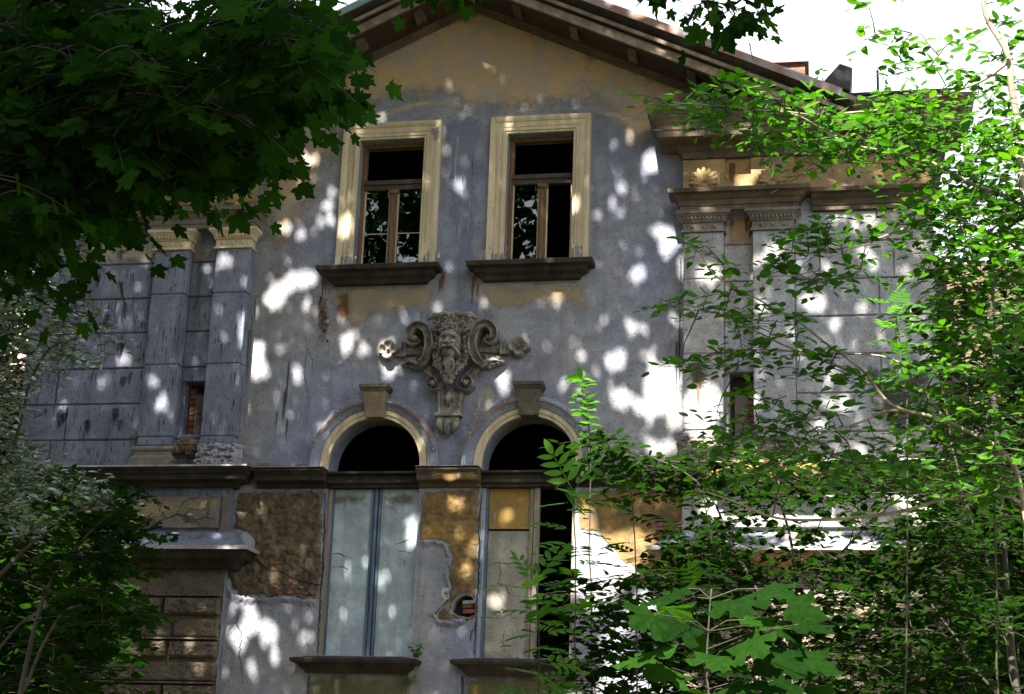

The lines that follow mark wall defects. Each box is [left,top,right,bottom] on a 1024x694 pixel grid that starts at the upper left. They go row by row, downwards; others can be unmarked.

crack [143,497,214,525]
flaking render [226,489,325,608]
flaking render [417,488,479,629]
flaking render [577,486,682,579]